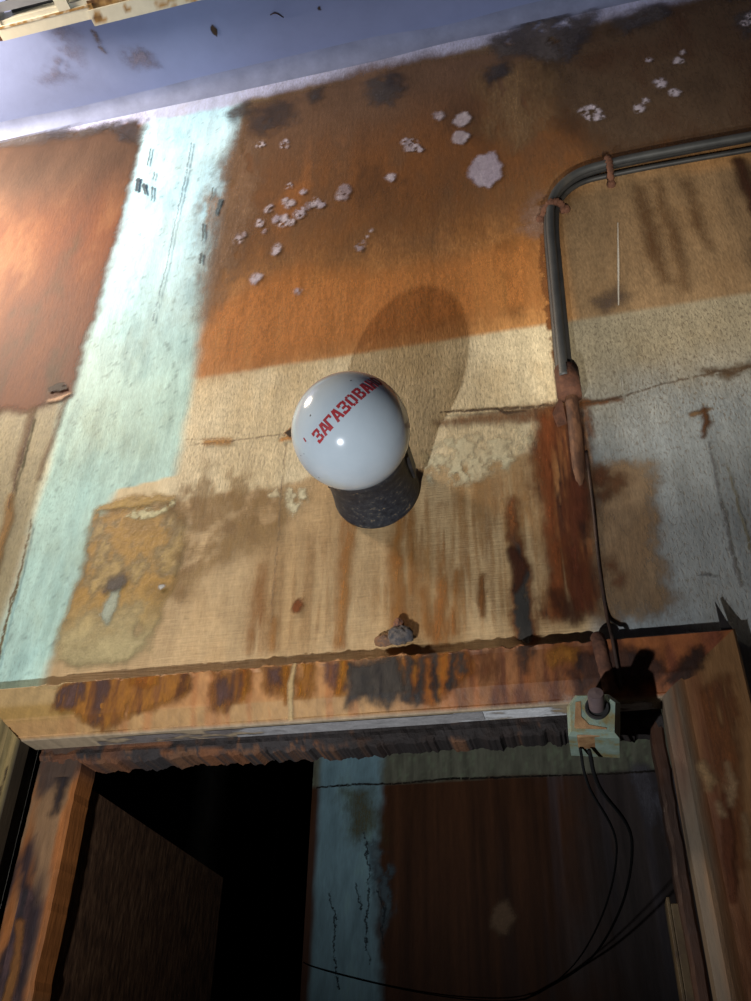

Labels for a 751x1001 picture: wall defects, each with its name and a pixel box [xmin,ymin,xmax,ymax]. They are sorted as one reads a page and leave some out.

water stain [478,0,751,155]
crack [153,143,192,319]
crack [440,404,553,414]
crack [591,366,751,403]
corrosion [439,398,620,625]
peeling [56,494,188,667]
corrosion [547,645,601,695]
corrosion [609,645,704,691]
corrosion [52,673,242,746]
peeling [236,707,567,737]